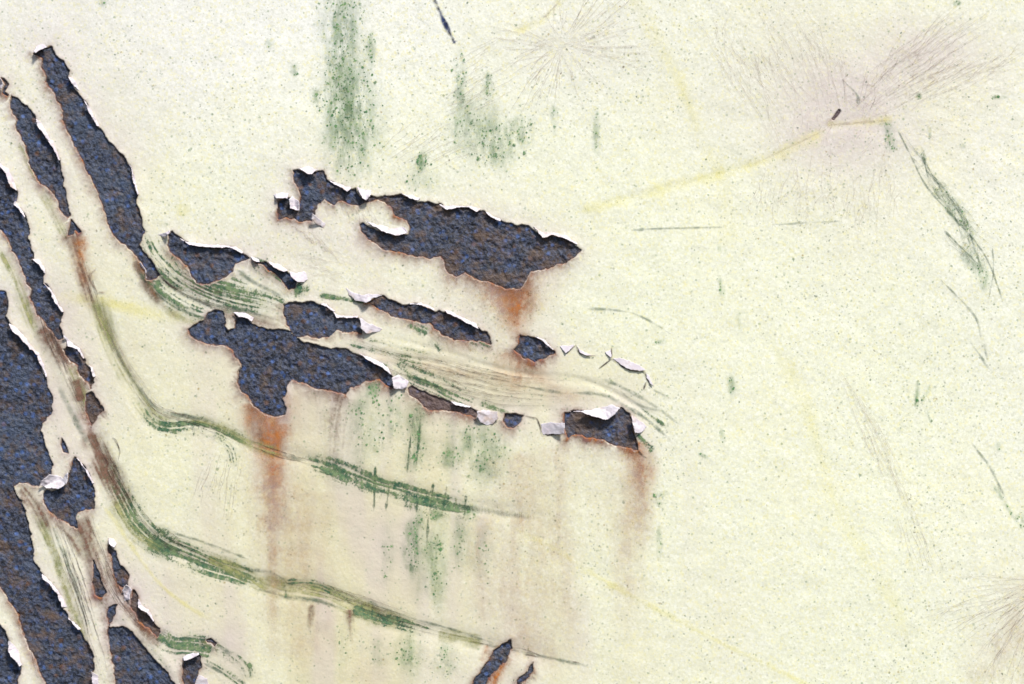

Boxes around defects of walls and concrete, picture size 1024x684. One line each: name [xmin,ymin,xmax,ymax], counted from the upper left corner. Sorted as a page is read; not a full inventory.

peeling [0,78,82,238]
peeling [0,291,99,684]
peeling [0,163,104,426]
peeling [33,44,160,282]
rust [259,415,282,485]
peeling [158,230,522,429]
water stain [314,2,387,181]
water stain [309,454,475,595]
peeling [273,166,581,291]
peeling [512,335,653,385]
peeling [541,405,646,454]
peeling [91,538,208,684]